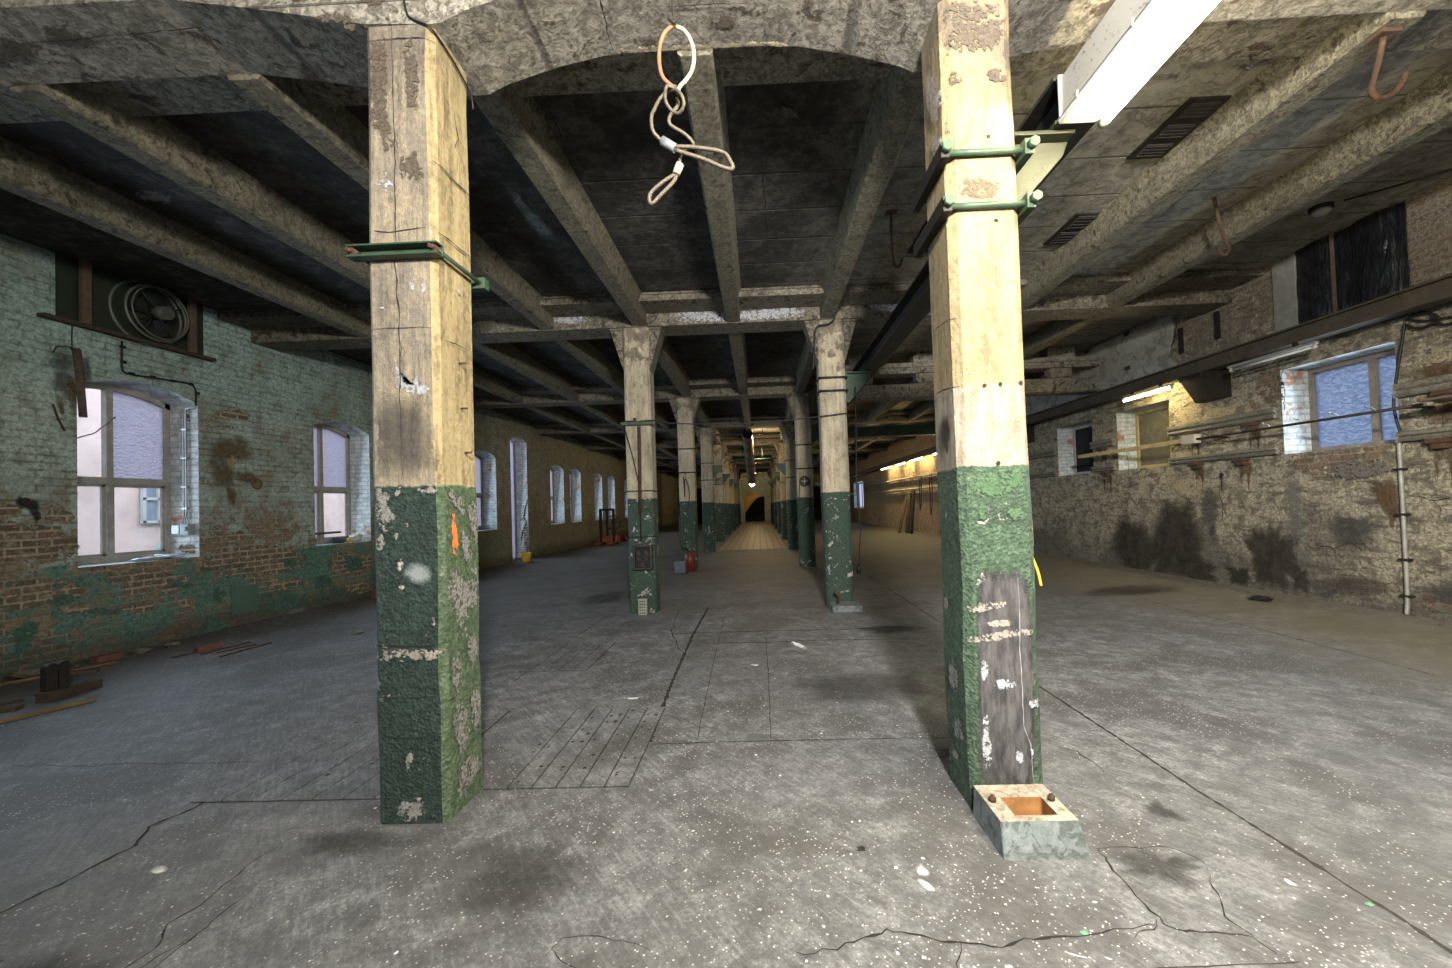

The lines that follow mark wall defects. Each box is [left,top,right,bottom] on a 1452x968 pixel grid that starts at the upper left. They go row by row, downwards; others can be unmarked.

rust [1374,482,1397,527]
peeling [329,487,482,793]
spalling [966,601,1033,643]
peeling [949,660,958,694]
peeling [981,660,1017,690]
peeling [951,717,963,760]
peeling [982,715,992,768]
peeling [397,797,428,822]
crack [1,802,204,913]
crack [796,846,1277,968]
crack [545,935,650,968]